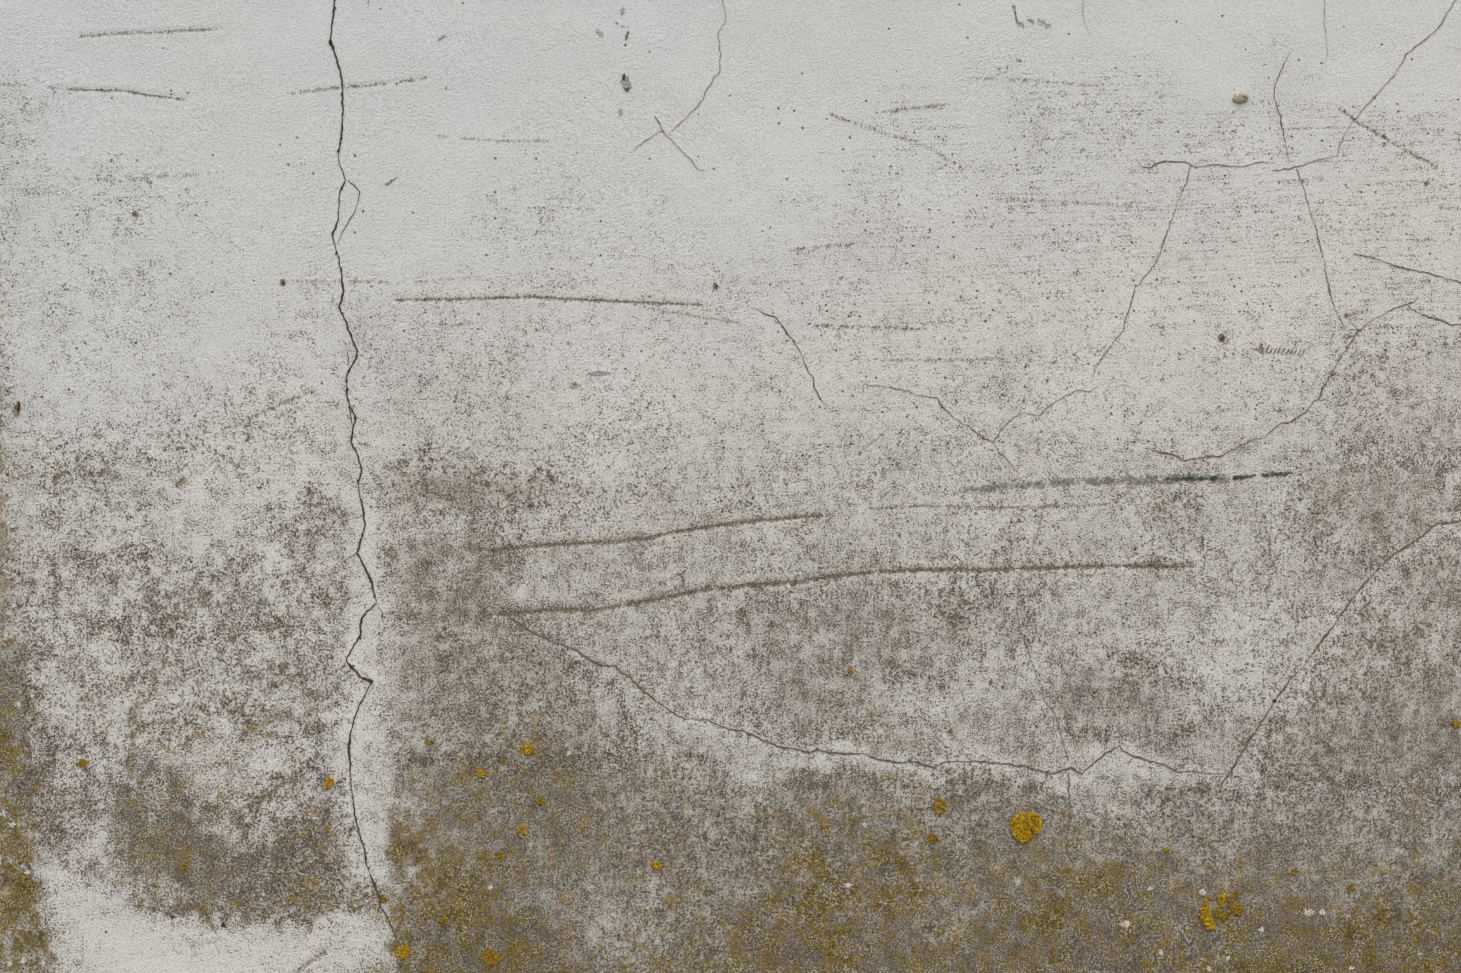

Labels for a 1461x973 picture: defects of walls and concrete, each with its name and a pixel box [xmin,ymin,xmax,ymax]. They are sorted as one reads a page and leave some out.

crack [329,0,398,947]
leakage [0,312,1461,973]
crack [496,0,1461,873]